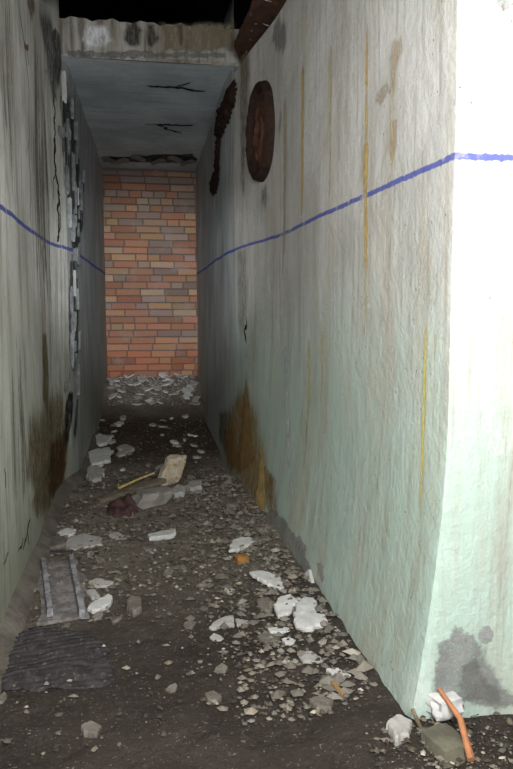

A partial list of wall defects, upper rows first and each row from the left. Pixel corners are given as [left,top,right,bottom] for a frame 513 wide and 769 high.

damp [34,17,56,104]
damp [33,75,52,325]
peeling [53,28,225,463]
damp [12,376,27,498]